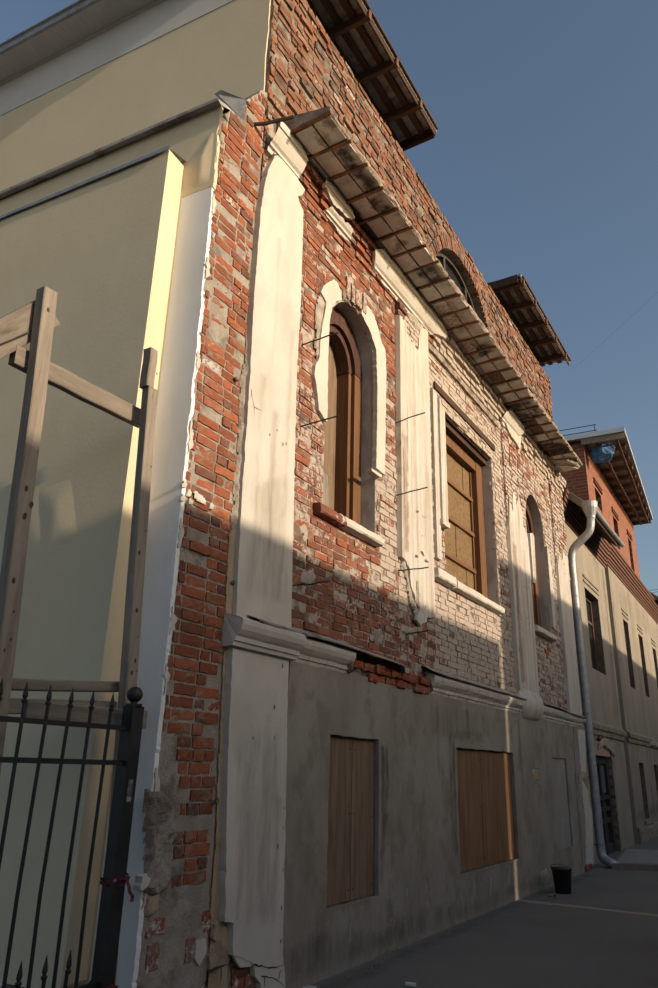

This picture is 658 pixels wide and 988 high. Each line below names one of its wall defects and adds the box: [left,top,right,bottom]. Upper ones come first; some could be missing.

spalling [226,334,249,614]
peeling [179,481,194,505]
flaking render [353,660,430,695]
spalling [133,647,256,988]
crack [254,964,284,986]